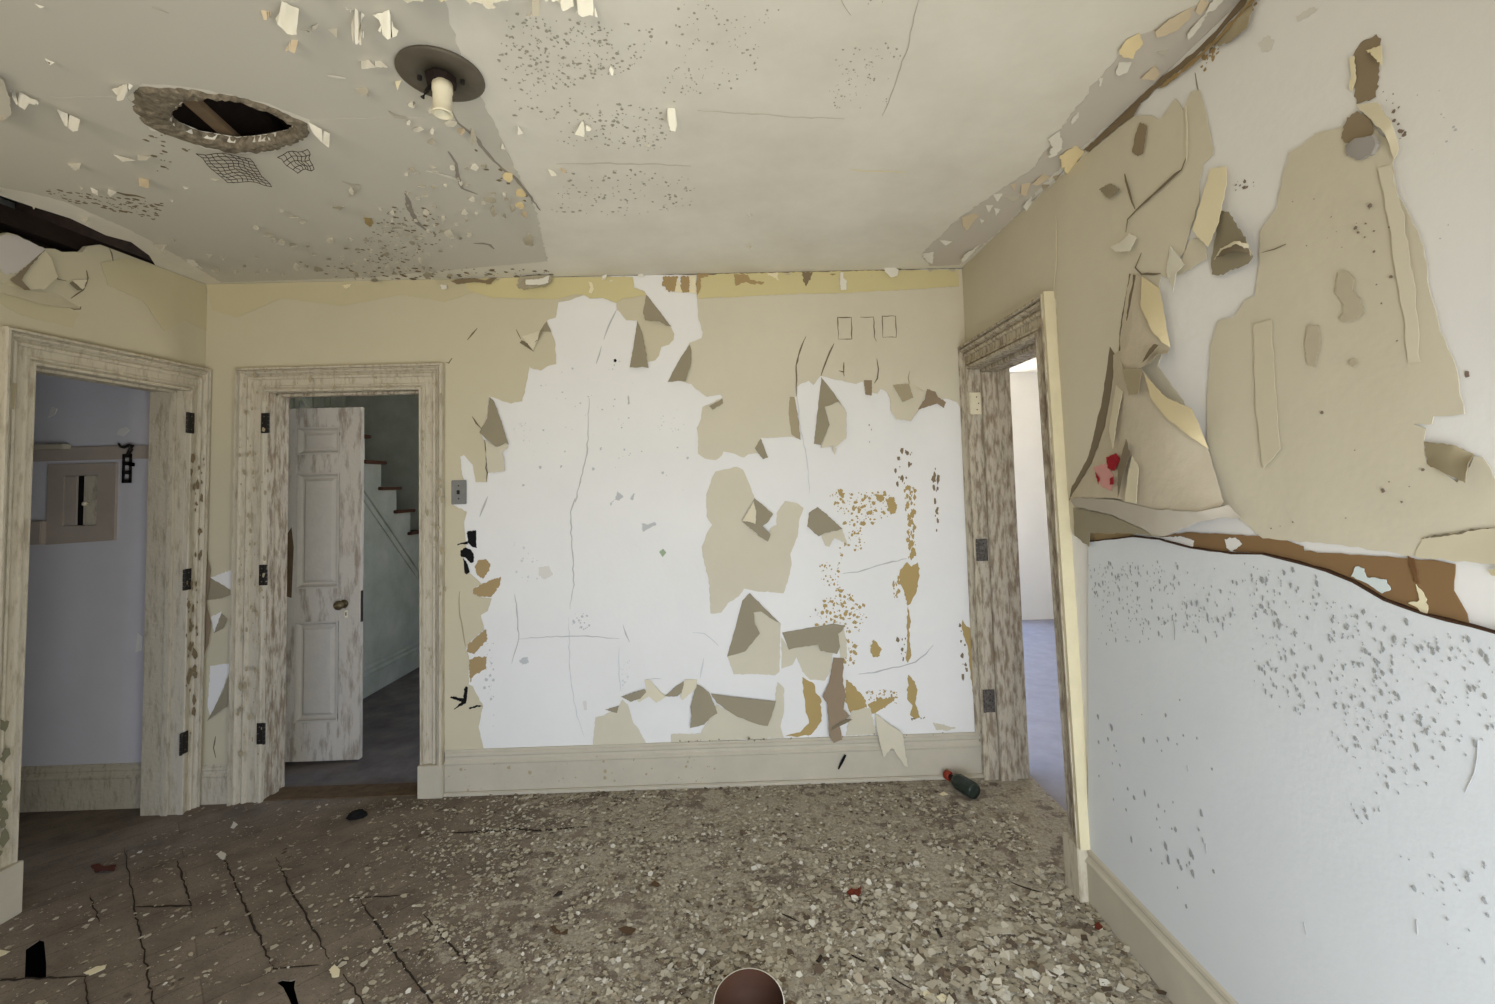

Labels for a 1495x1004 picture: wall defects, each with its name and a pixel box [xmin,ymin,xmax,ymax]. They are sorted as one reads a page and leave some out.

spalling [112,84,330,154]
crack [698,110,844,119]
crack [882,0,919,116]
spalling [922,0,1240,272]
spalling [1341,35,1399,160]
spalling [457,530,501,597]
crack [512,402,659,735]
spalling [845,562,920,719]
mould [1090,561,1494,824]
spalling [1090,533,1495,634]
mould [1113,787,1204,909]
mould [1411,853,1486,921]